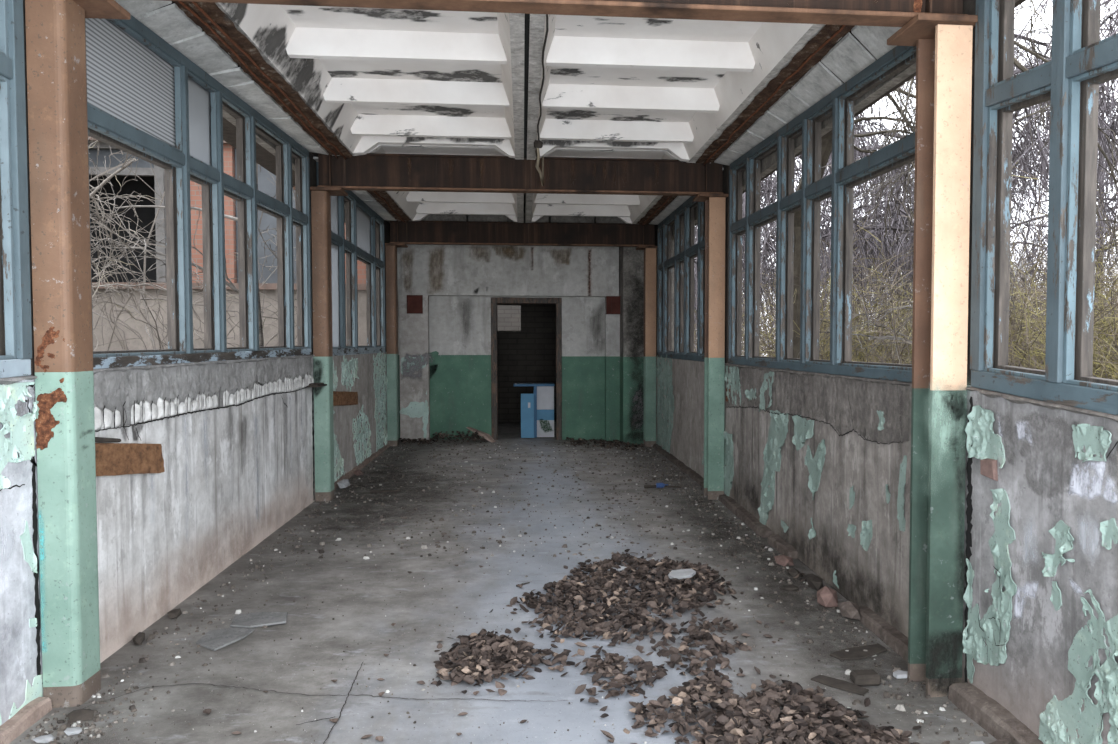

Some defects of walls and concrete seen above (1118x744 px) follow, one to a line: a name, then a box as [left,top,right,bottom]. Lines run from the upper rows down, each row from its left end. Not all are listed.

spalling [174,1,501,159]
peeling [549,110,596,120]
spalling [695,24,855,166]
peeling [0,382,37,489]
rust [34,327,65,372]
rust [33,378,67,450]
spalling [93,357,314,440]
spalling [725,366,912,533]
peeling [1072,424,1112,462]
peeling [20,521,38,573]
peeling [962,405,1017,683]
peeling [1038,589,1118,744]